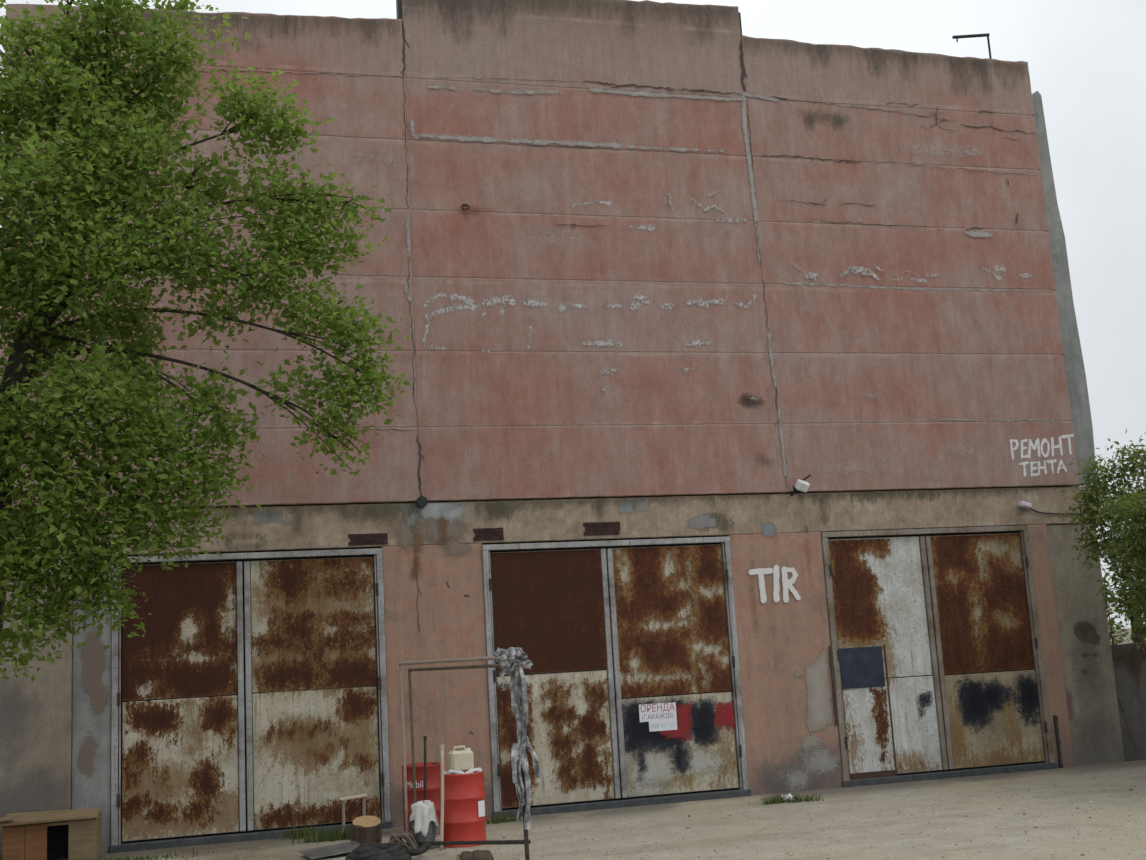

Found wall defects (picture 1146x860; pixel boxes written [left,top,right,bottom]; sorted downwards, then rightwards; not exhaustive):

peeling [410,120,725,153]
crack [436,40,1036,334]
peeling [403,283,586,351]
peeling [605,293,758,310]
peeling [784,262,1035,292]
corrosion [122,557,381,841]
corrosion [491,545,737,808]
flaking render [795,649,833,754]
corrosion [829,534,1044,773]